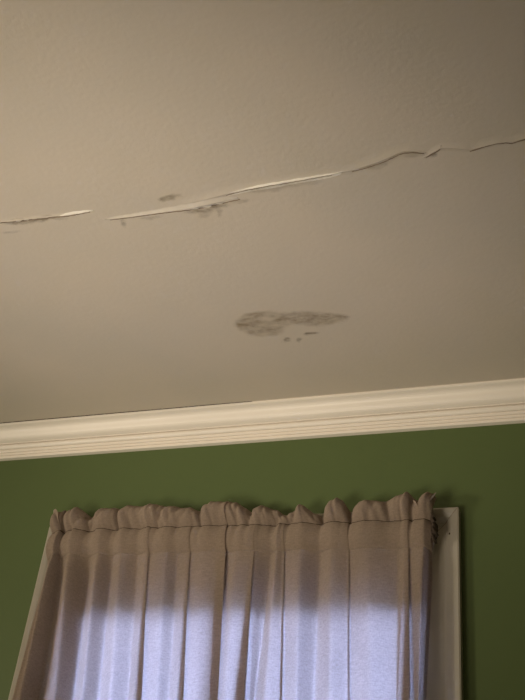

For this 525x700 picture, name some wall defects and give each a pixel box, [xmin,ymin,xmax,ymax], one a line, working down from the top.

crack [0,131,525,224]